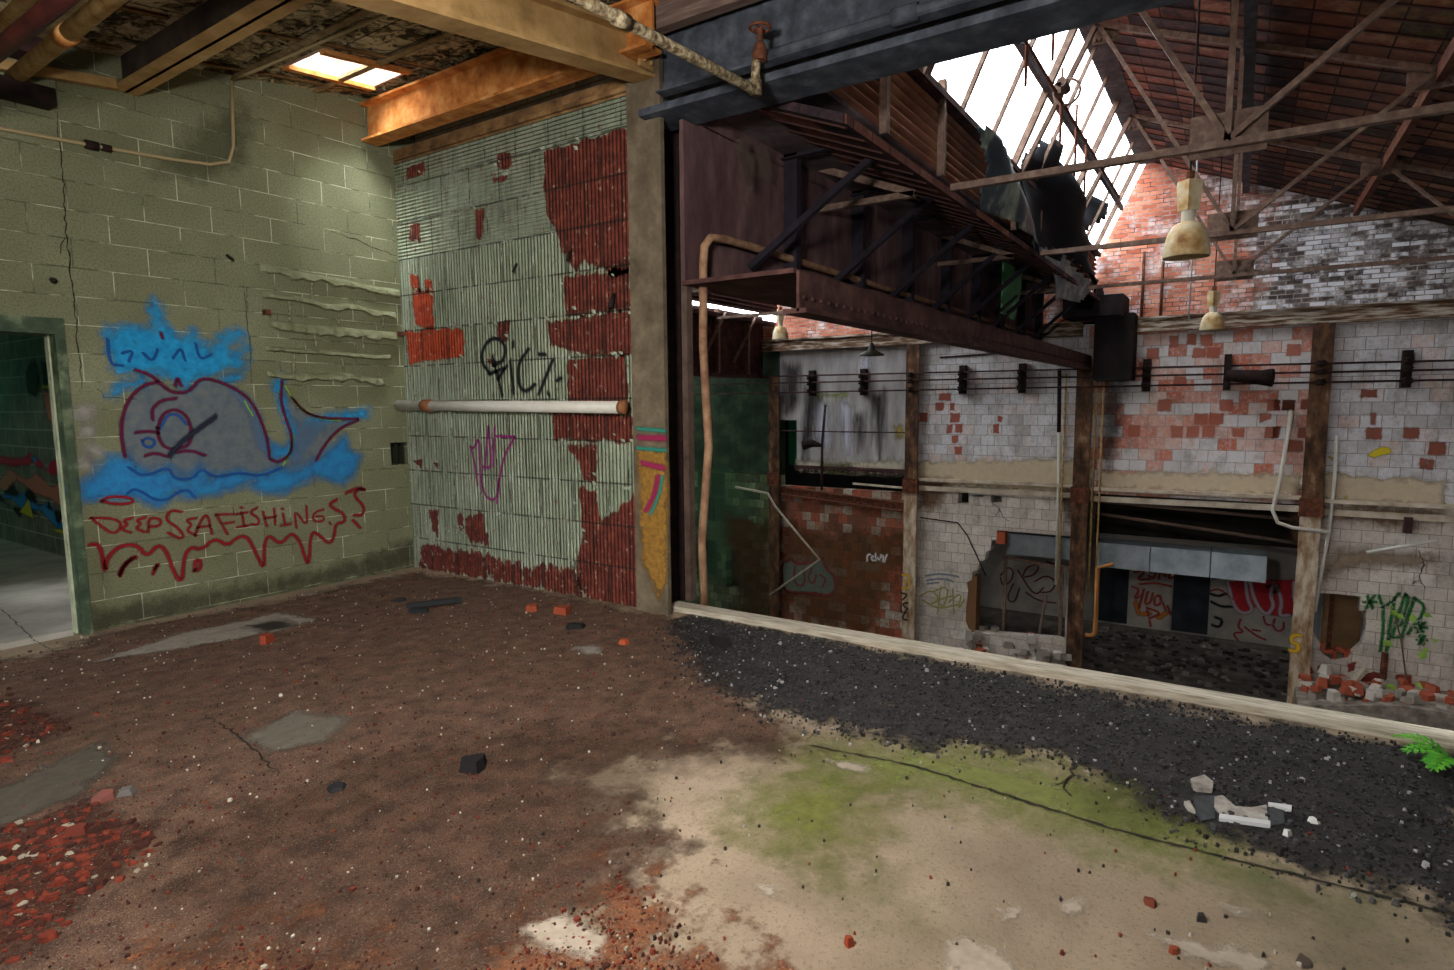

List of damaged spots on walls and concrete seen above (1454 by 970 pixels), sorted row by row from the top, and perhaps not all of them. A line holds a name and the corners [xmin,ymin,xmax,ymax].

rust [283,48,413,92]
peeling [403,161,425,181]
peeling [408,223,421,243]
peeling [401,272,465,366]
peeling [417,128,637,607]
peeling [1139,334,1220,371]
peeling [1286,344,1301,356]
peeling [919,393,963,455]
damp [784,364,1300,494]
peeling [1158,377,1308,452]